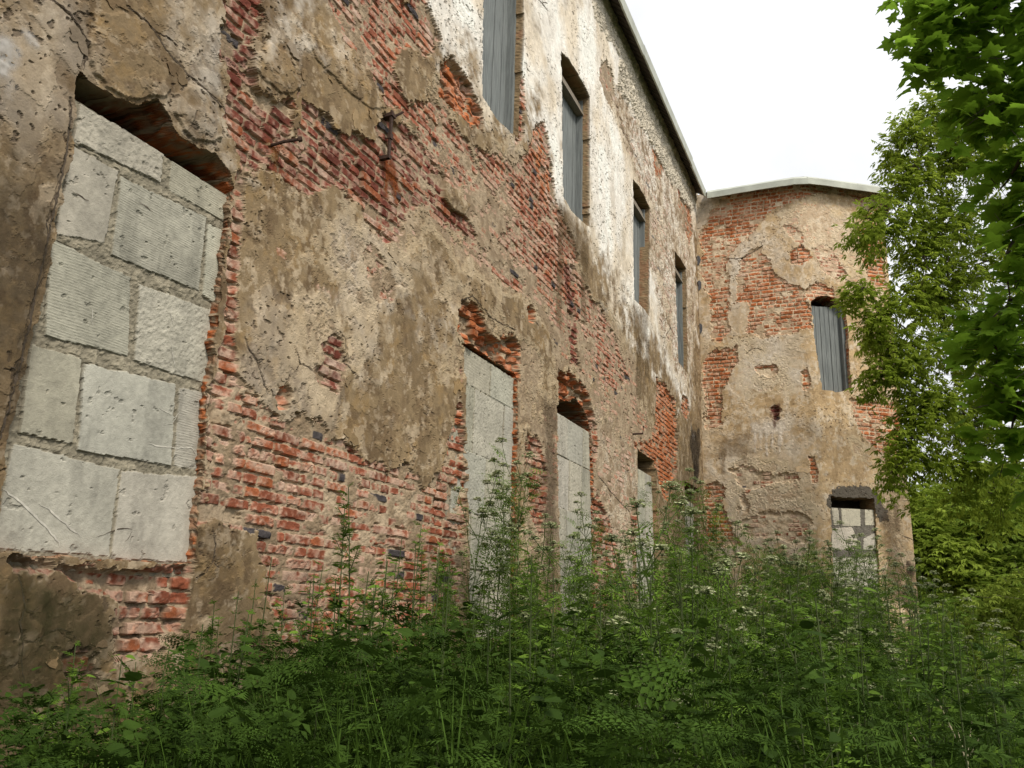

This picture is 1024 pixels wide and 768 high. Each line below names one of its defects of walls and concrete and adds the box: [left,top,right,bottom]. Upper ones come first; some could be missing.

crack [52,0,91,70]
crack [128,7,226,116]
flaking render [196,0,631,674]
flaking render [592,0,888,506]